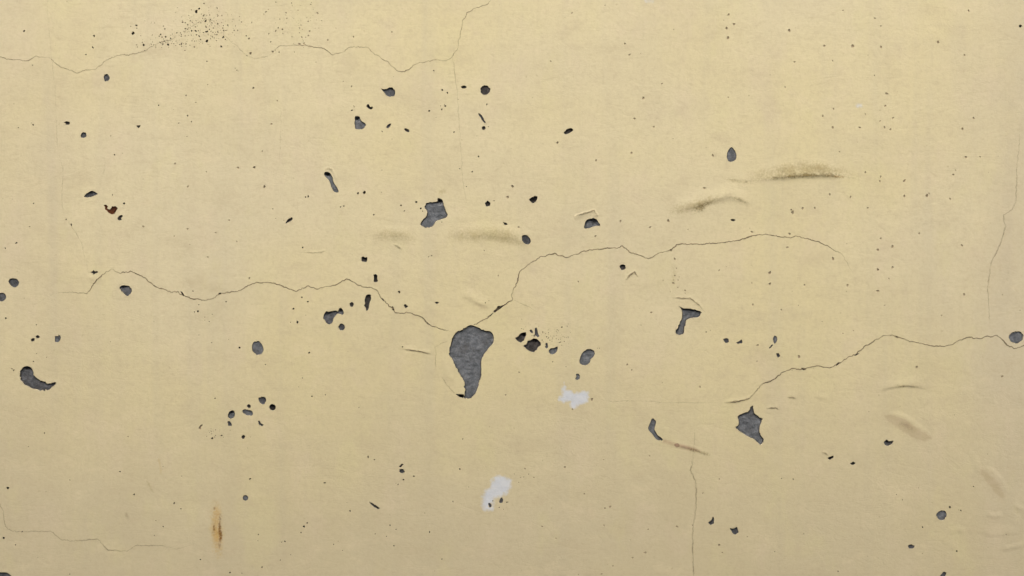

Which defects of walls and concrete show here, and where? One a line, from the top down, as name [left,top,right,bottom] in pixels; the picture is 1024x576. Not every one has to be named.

spalling [415,198,448,228]
crack [88,271,443,330]
crack [474,234,834,325]
spalling [675,306,702,335]
spalling [11,324,56,391]
spalling [449,325,494,399]
crack [765,335,1024,383]
spalling [648,418,663,441]
spalling [735,406,764,445]
rust [206,494,228,565]